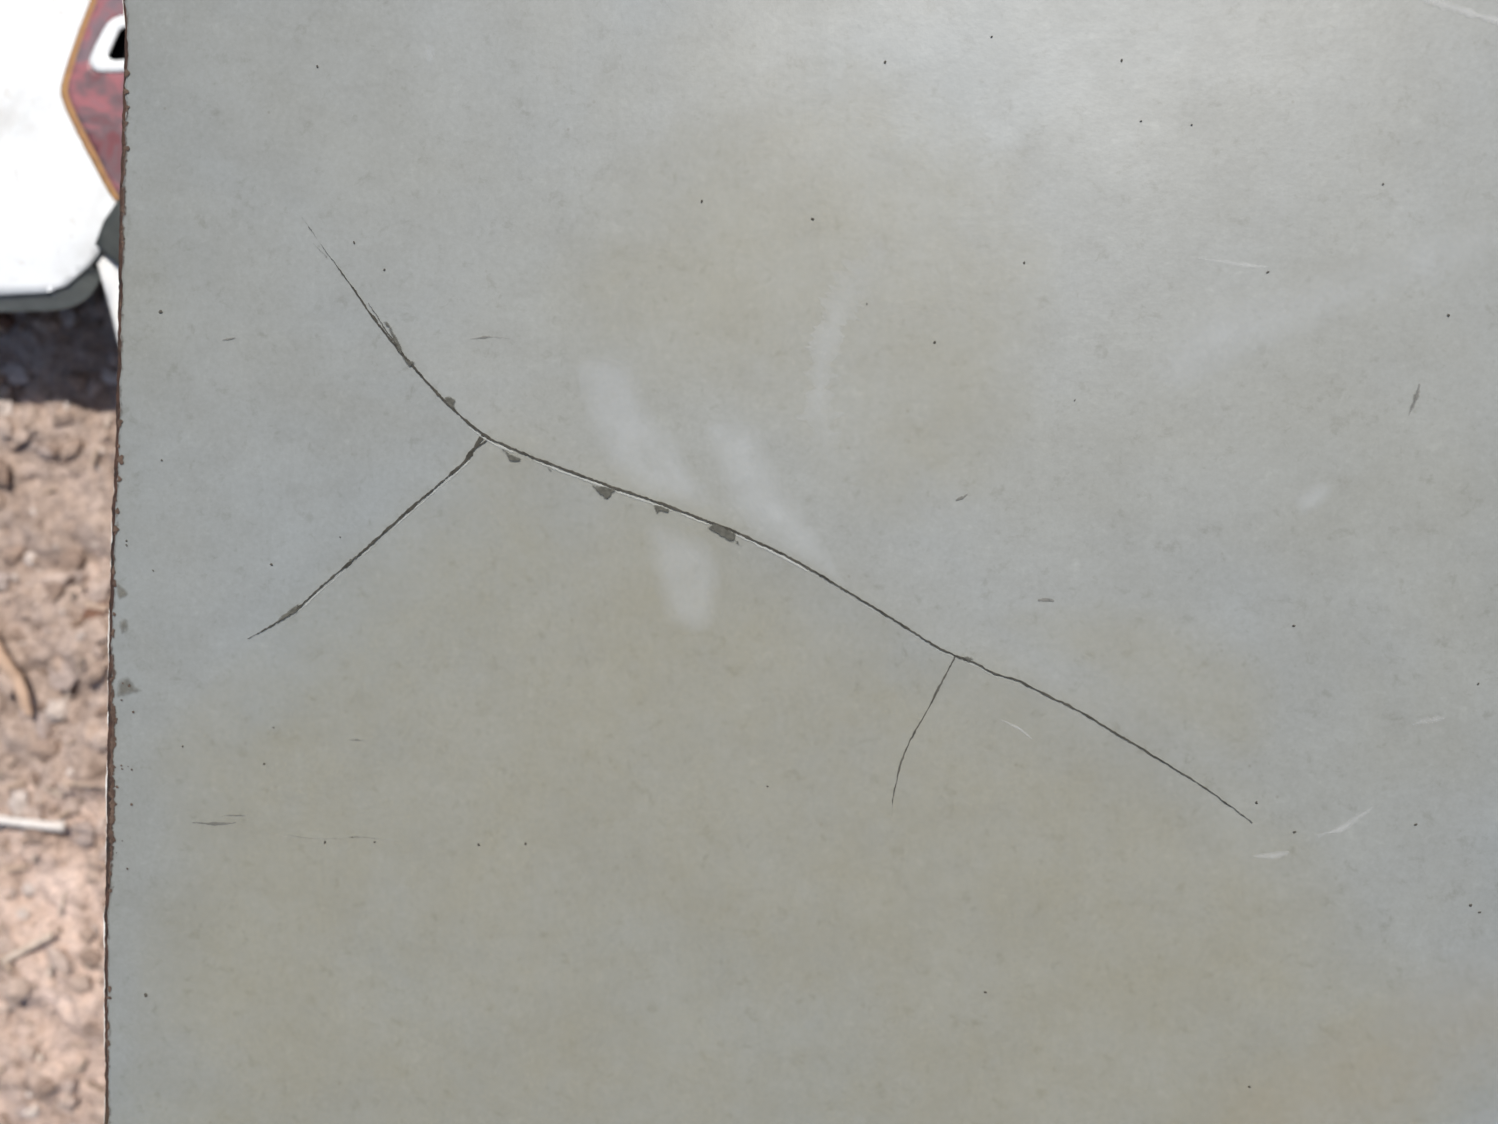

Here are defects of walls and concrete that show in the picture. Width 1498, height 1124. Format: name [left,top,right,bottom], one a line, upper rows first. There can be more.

crack [248,226,1253,823]